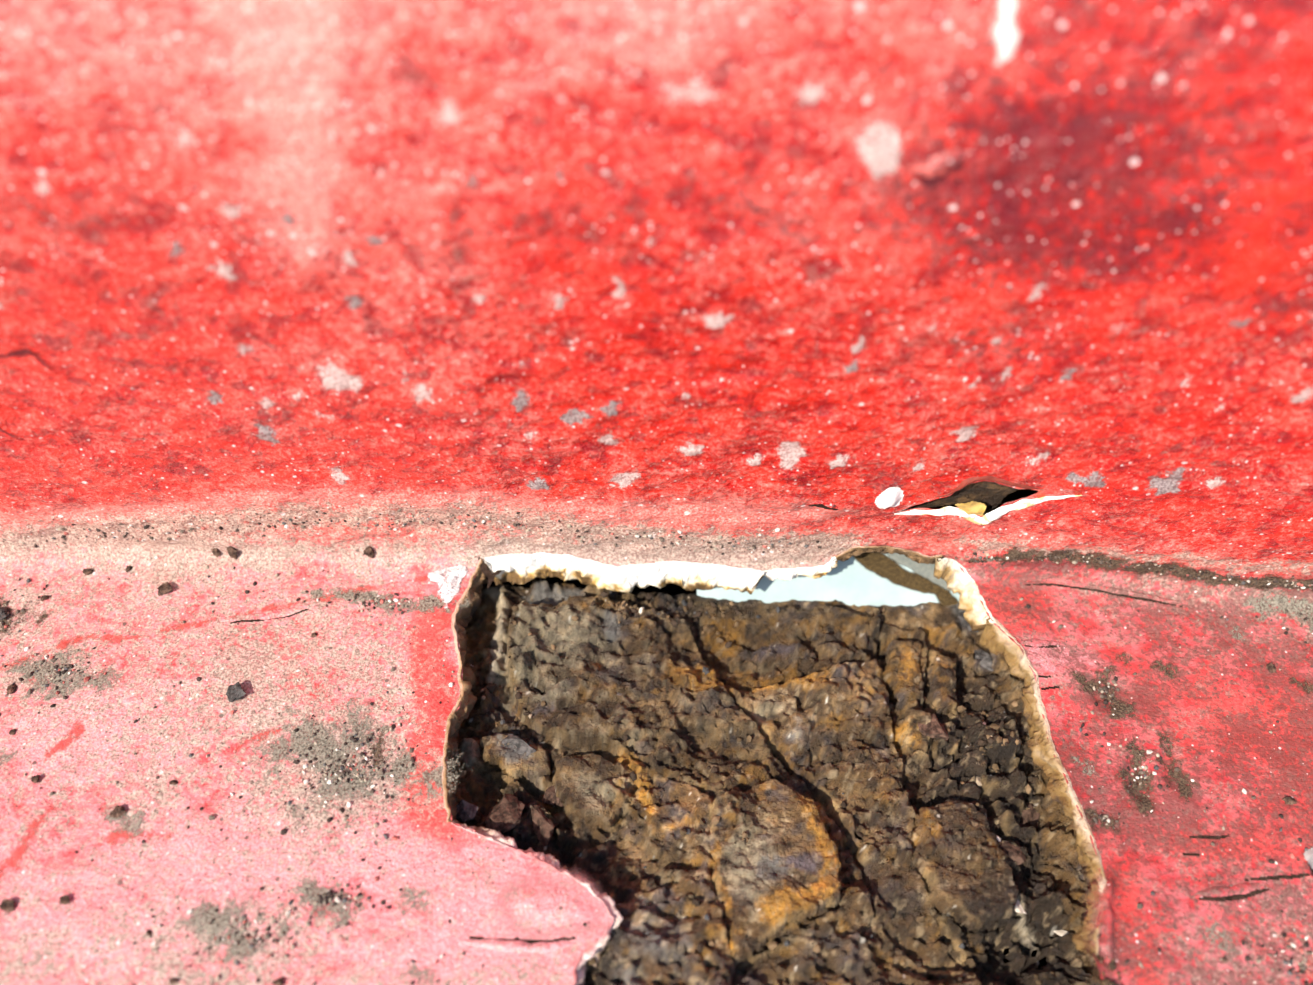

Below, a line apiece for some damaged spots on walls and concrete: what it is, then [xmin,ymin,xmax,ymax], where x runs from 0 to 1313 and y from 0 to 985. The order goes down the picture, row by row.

spalling [428,546,1107,985]